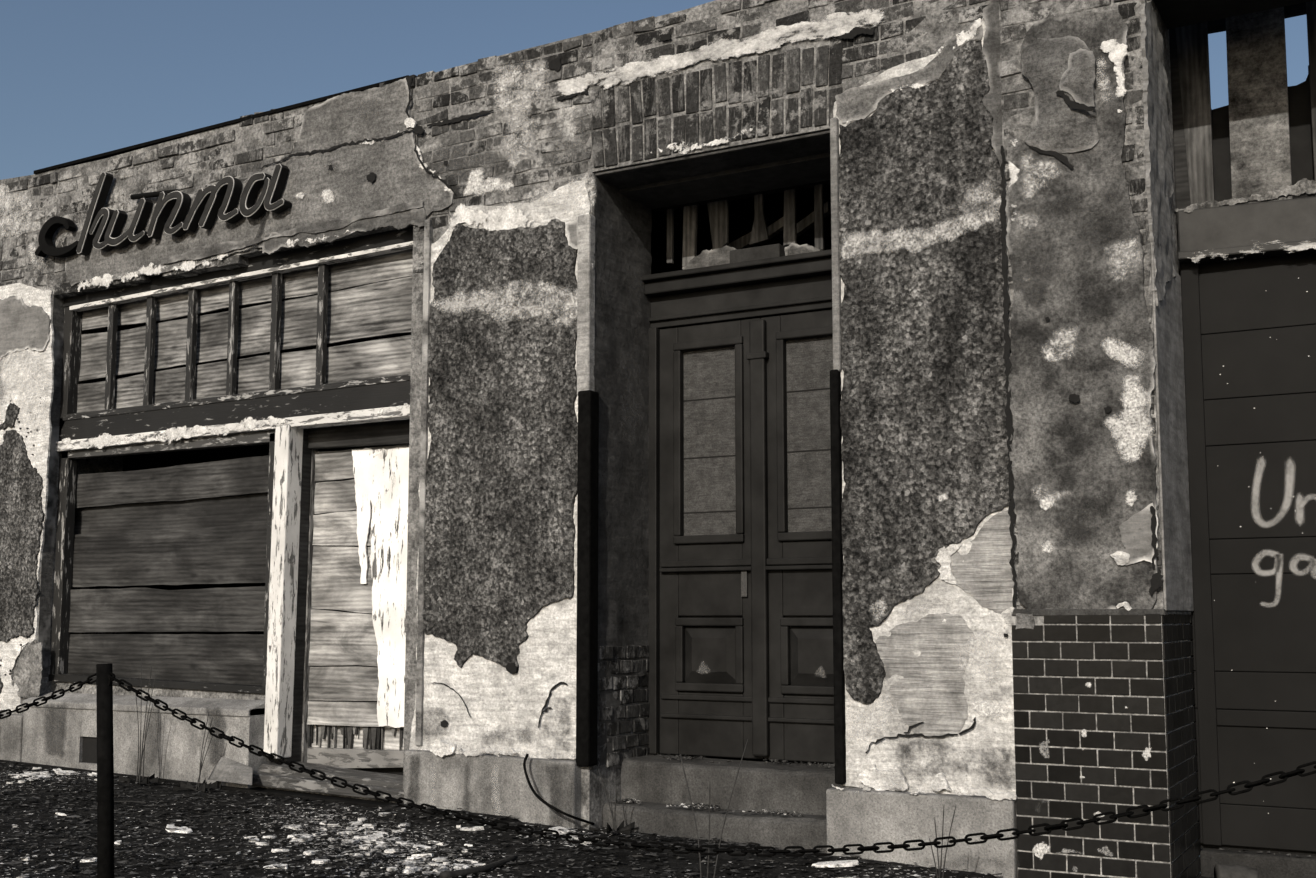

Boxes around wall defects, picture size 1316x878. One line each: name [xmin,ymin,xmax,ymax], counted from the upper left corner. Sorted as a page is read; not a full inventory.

peeling [548,8,885,101]
flaking render [835,18,983,124]
flaking render [651,128,752,155]
peeling [78,253,228,292]
flaking render [0,397,45,698]
peeling [352,447,409,728]
flaking render [935,510,1014,614]
crack [432,682,471,718]
crack [538,682,568,728]
flaking render [858,764,910,791]
crack [865,717,976,753]
flaking render [876,613,977,738]